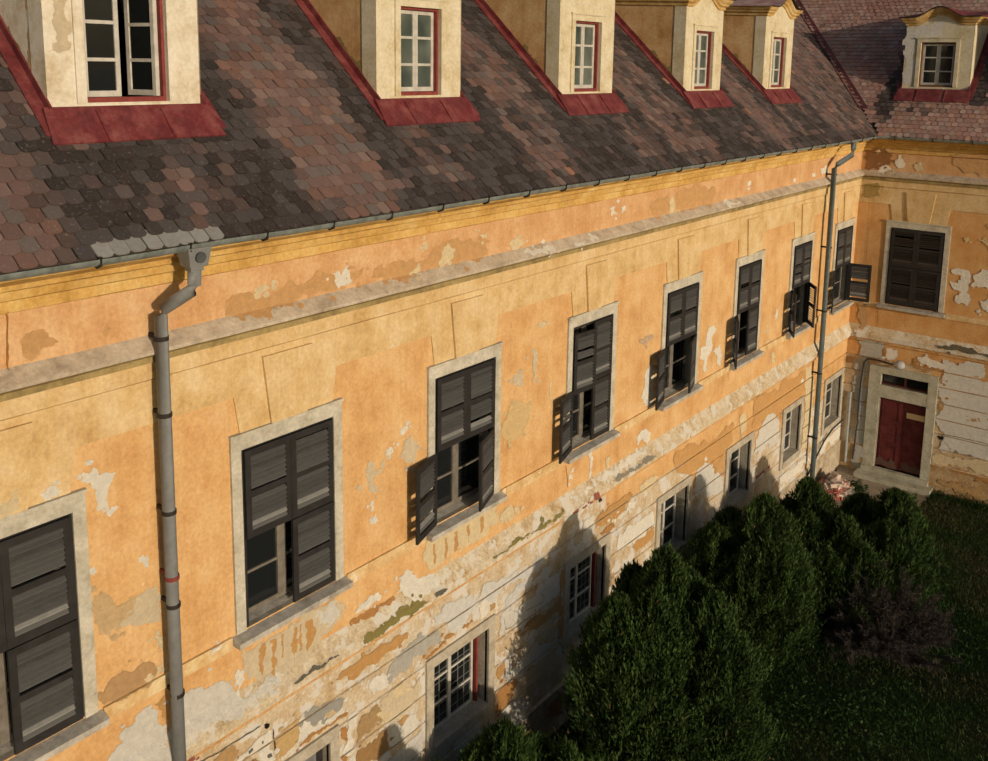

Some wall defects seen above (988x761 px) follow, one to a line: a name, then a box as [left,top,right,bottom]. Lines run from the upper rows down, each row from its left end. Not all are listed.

peeling [950,268,988,316]
peeling [700,325,722,372]
peeling [779,366,841,484]
peeling [917,354,988,477]
peeling [77,460,118,517]
peeling [693,457,723,498]
peeling [90,567,164,650]
peeling [184,505,524,739]
peeling [369,553,560,761]
peeling [108,700,173,761]
peeling [237,723,280,761]
spalling [298,697,359,761]